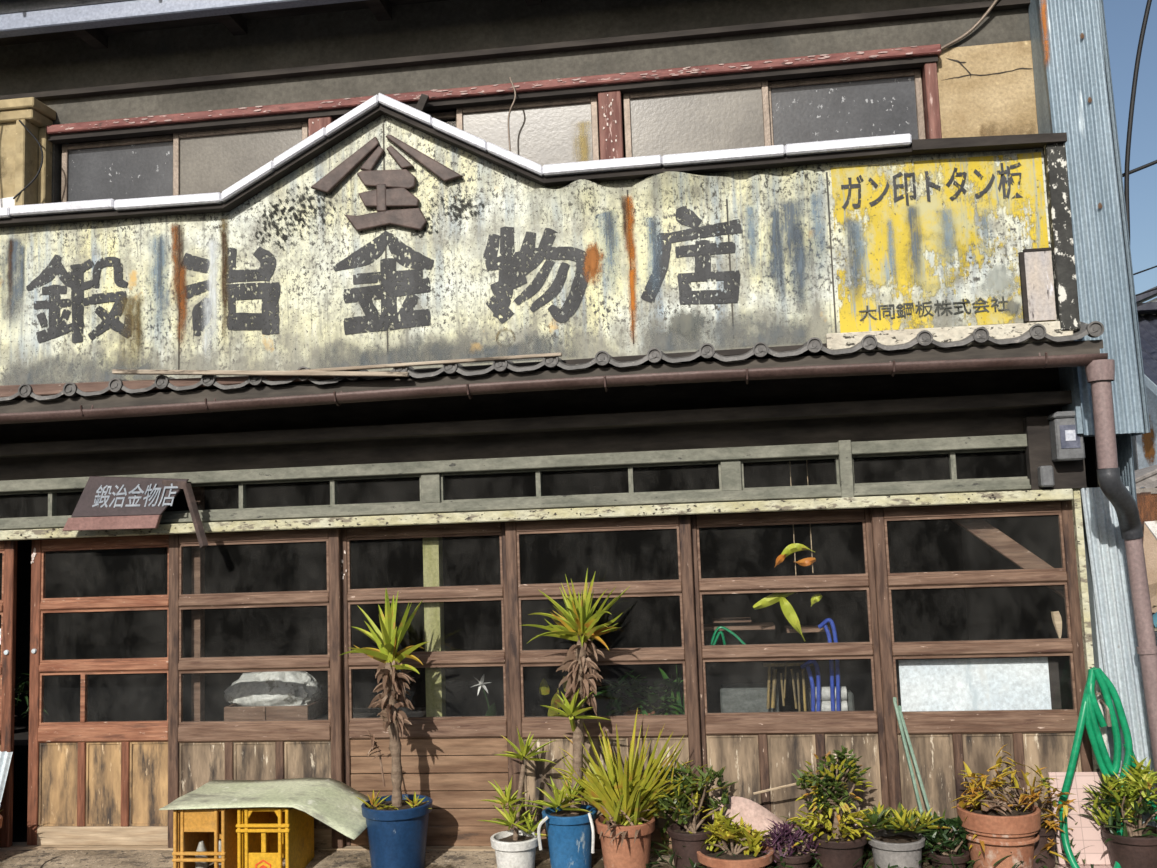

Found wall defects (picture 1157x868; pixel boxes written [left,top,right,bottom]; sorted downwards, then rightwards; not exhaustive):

rust [1041,0,1049,62]
crack [944,58,1033,80]
rust [171,225,186,326]
rust [584,244,603,282]
rust [621,197,635,330]
peeling [847,220,863,287]
peeling [908,206,919,268]
peeling [943,210,954,248]
rust [1142,428,1155,463]